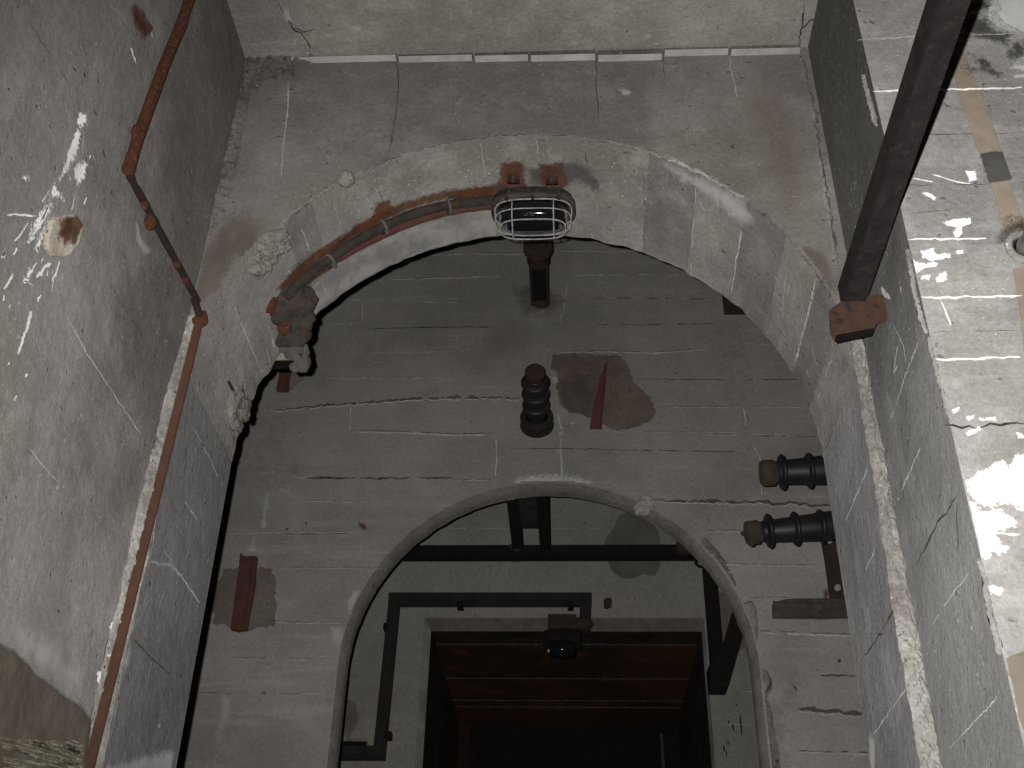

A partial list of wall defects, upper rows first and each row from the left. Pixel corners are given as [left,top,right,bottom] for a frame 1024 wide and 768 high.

corrosion [132,6,153,37]
crack [277,1,315,48]
crack [799,1,838,264]
peeling [1,112,94,366]
corrosion [280,162,527,291]
crack [944,421,1024,429]